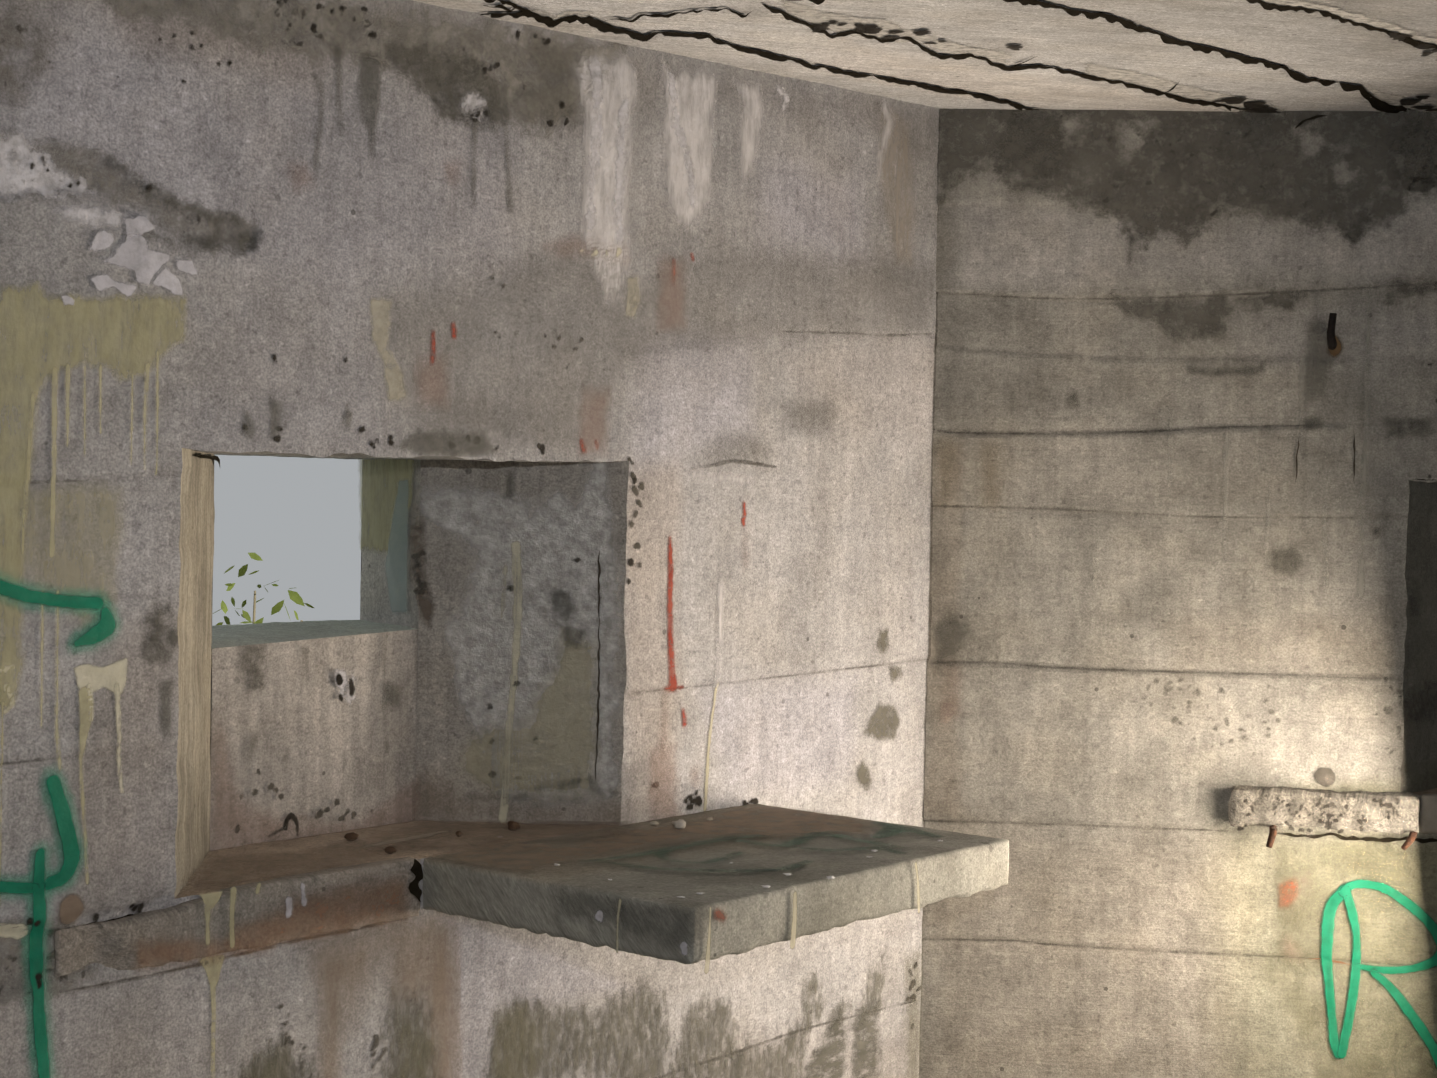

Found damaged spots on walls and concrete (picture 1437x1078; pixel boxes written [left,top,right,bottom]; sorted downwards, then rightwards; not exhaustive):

leakage [0,135,120,226]
peeling [12,149,256,296]
leakage [361,42,508,129]
leakage [578,57,635,299]
leakage [664,70,715,223]
leakage [739,85,762,175]
crack [480,0,1437,128]
leakage [938,108,1437,246]
leakage [1111,290,1232,339]
leakage [370,993,435,1078]
leakage [492,974,883,1078]
leakage [906,962,921,1001]